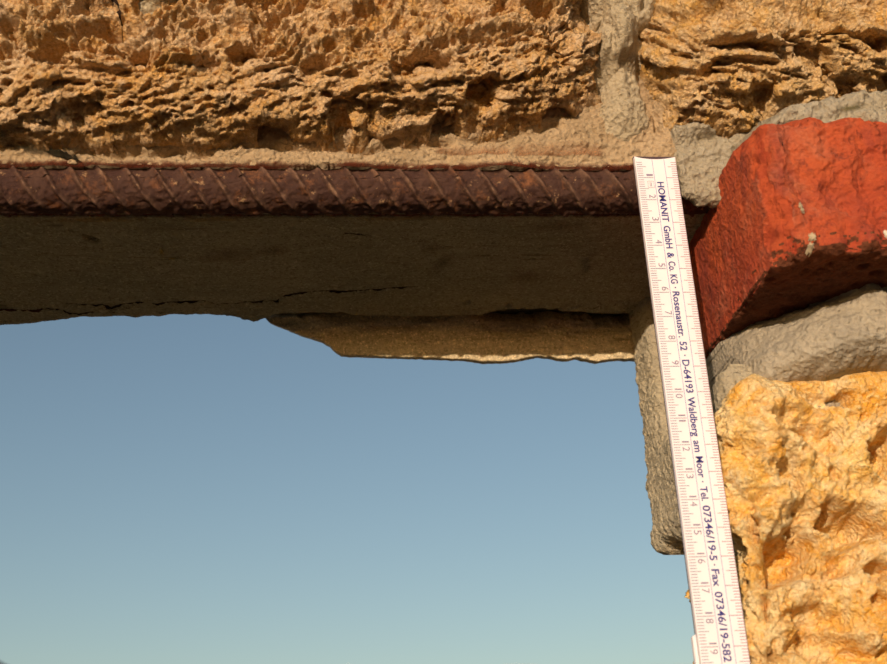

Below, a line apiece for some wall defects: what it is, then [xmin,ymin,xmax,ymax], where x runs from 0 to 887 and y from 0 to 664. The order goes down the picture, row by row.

crack [111,0,123,40]
corrosion [0,161,301,169]
corrosion [338,161,634,171]
crack [0,286,418,315]